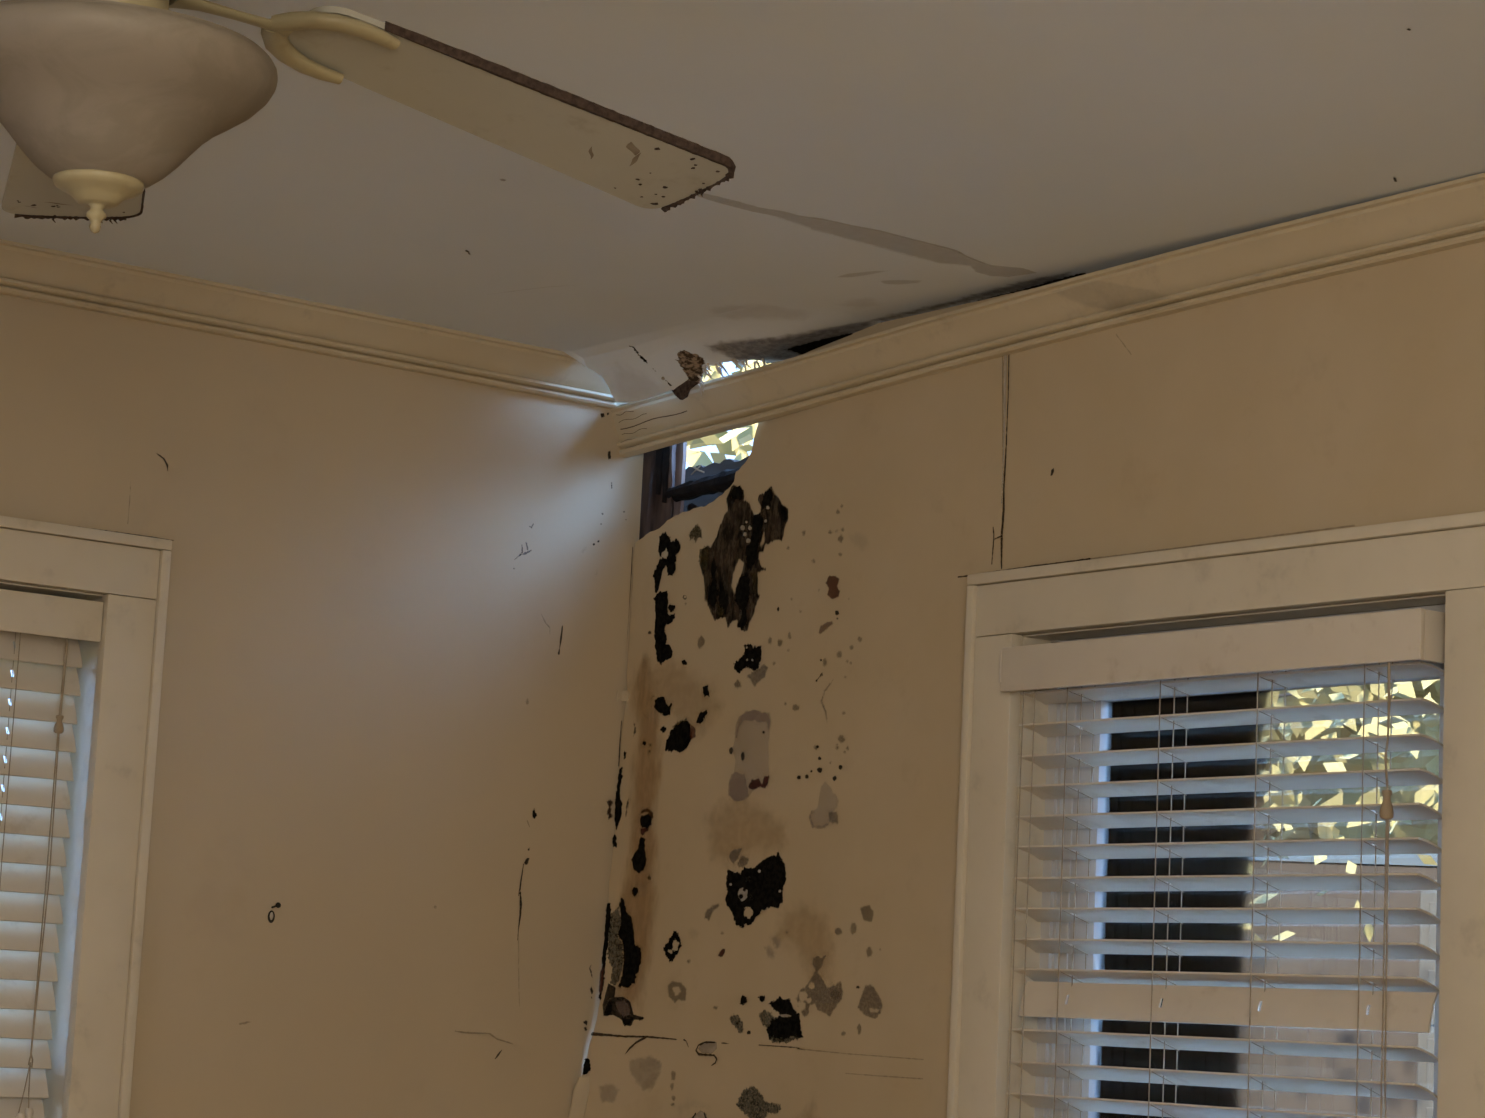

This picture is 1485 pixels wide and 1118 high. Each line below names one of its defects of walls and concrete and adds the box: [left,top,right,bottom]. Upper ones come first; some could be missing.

crack [958,355,1090,578]
mould [648,485,788,687]
mould [654,684,709,753]
mould [583,801,653,1031]
water stain [663,931,682,962]
mould [705,852,786,928]
mould [730,956,882,1044]
mould [736,1086,781,1118]